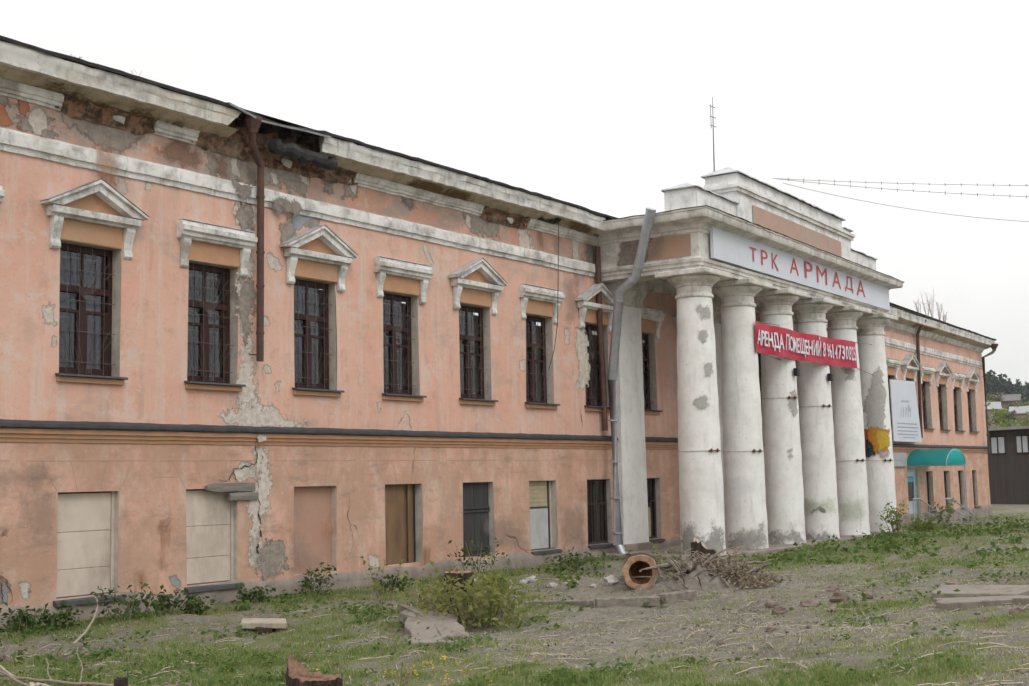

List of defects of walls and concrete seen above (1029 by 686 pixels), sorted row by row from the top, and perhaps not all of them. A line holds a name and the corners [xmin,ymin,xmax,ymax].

flaking render [0,93,159,154]
flaking render [191,118,362,243]
flaking render [696,305,710,343]
peeling [564,326,591,389]
peeling [217,251,311,581]
flaking render [694,396,707,409]
flaking render [863,367,886,429]
peeling [0,578,31,604]